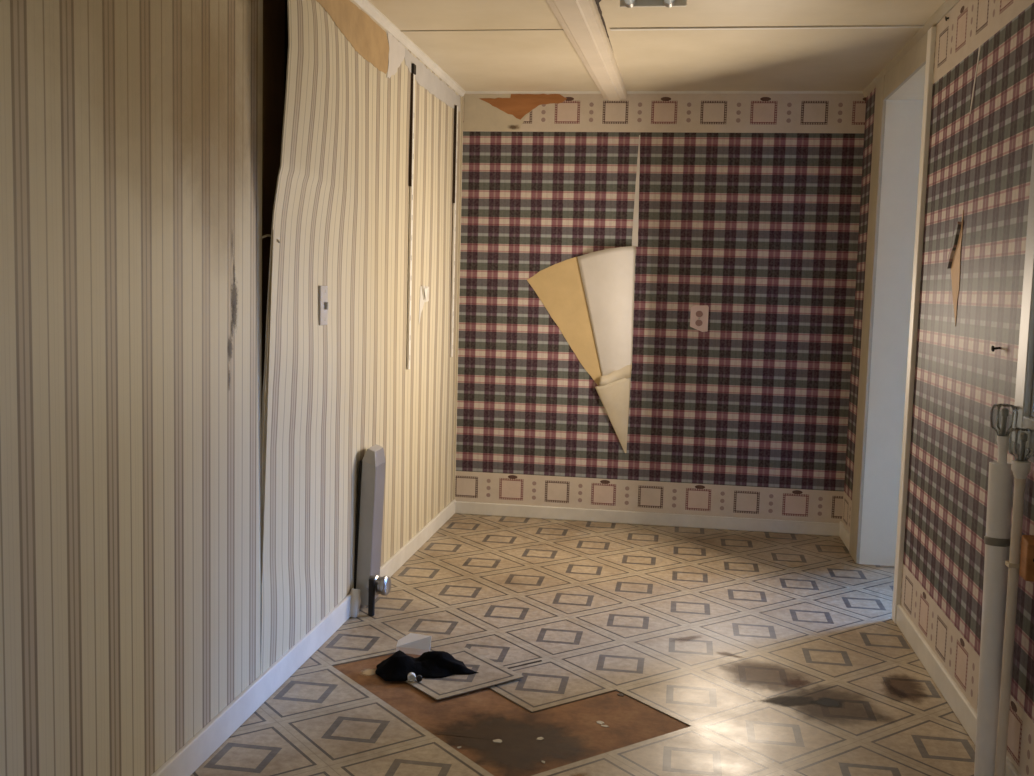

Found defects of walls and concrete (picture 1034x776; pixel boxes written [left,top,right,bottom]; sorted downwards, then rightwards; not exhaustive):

peeling [316,0,567,131]
leakage [228,265,238,357]
peeling [333,653,689,776]